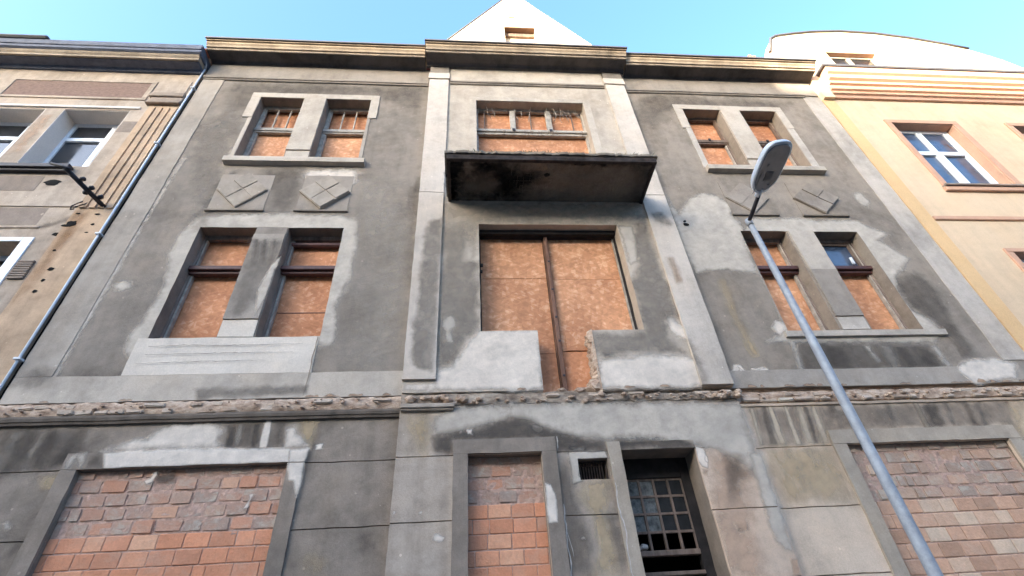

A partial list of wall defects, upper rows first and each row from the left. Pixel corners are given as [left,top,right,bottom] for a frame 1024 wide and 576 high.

damp [446,156,536,201]
spalling [584,329,614,402]
flaking render [693,383,831,403]
flaking render [944,379,1024,399]
flaking render [18,399,173,416]